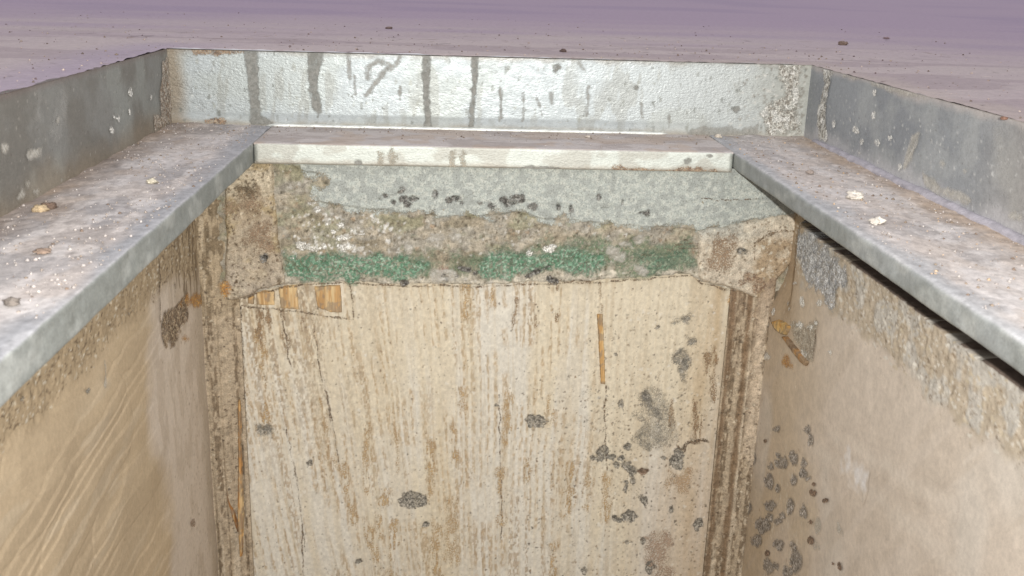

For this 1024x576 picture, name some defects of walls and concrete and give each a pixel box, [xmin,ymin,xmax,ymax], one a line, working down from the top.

water stain [244,51,273,125]
water stain [307,53,323,118]
water stain [347,54,401,97]
water stain [422,56,431,127]
water stain [468,57,478,127]
water stain [690,125,758,135]
peeling [285,158,847,309]
water stain [703,349,719,403]